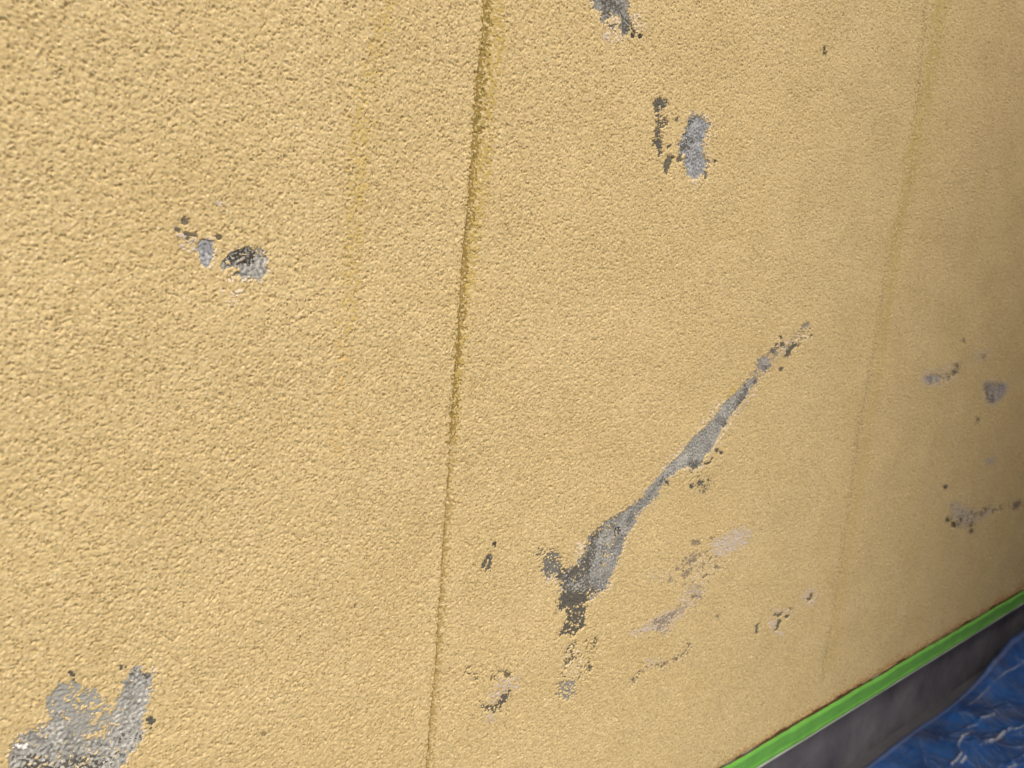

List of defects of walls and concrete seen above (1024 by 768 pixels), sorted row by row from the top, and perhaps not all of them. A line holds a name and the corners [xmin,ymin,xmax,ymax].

peeling [589,0,643,39]
crack [457,6,484,329]
peeling [652,96,716,179]
peeling [174,216,270,284]
peeling [770,324,812,372]
peeling [688,448,723,495]
crack [426,357,457,768]
peeling [534,547,566,582]
peeling [631,534,720,637]
peeling [6,663,156,768]